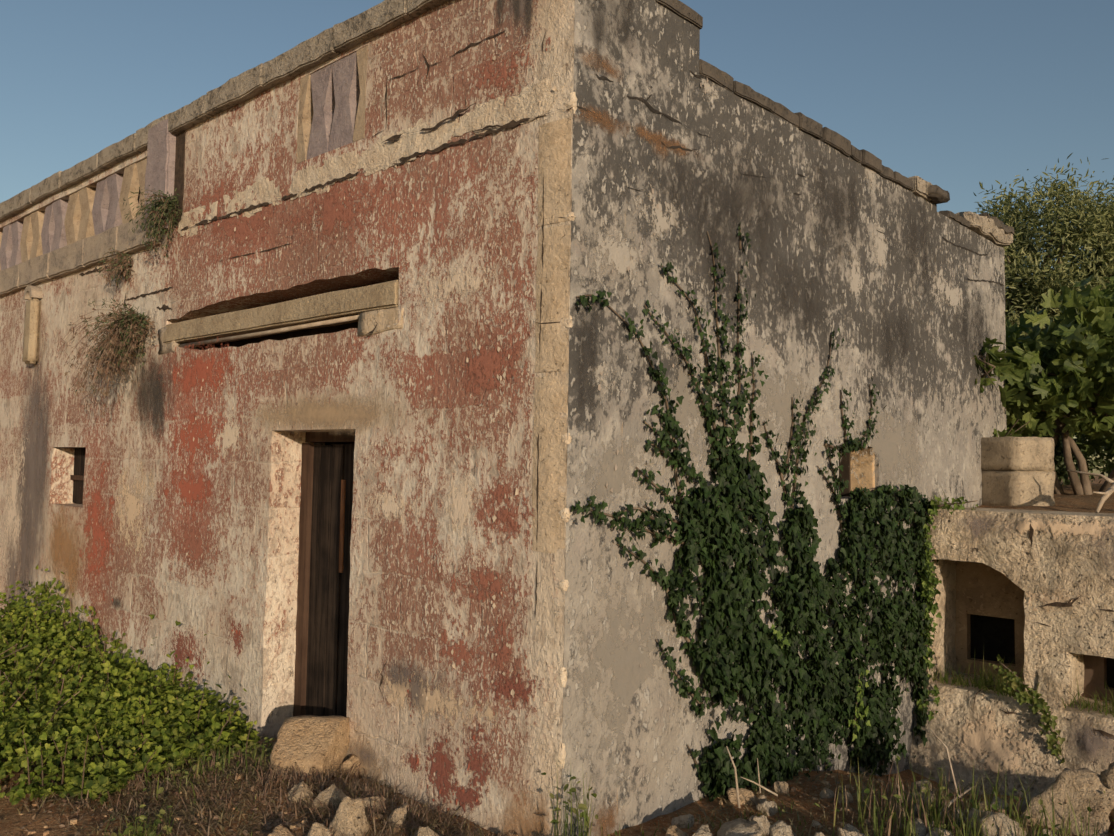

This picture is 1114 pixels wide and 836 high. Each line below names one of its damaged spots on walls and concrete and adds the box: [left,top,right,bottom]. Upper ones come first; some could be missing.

spalling [173,32,577,266]
crack [181,30,605,262]
peeling [403,264,496,307]
peeling [448,319,523,408]
peeling [0,429,28,608]
peeling [76,339,252,624]
peeling [364,492,423,524]
peeling [443,466,535,548]
peeling [162,627,208,684]
peeling [227,619,244,662]
peeling [366,563,542,824]